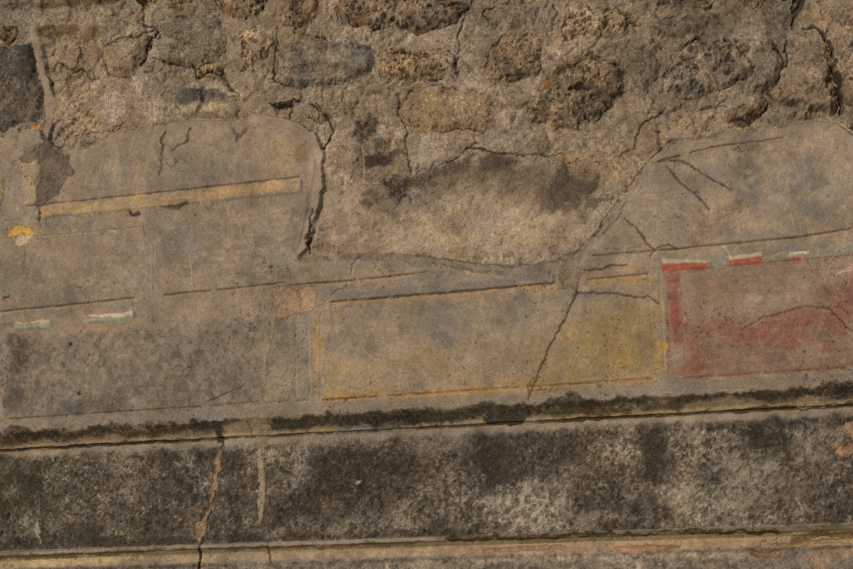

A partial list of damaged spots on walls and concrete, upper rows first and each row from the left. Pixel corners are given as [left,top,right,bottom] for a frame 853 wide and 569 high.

flaking render [650,111,733,140]
flaking render [20,123,74,206]
crack [529,264,650,394]
water stain [267,392,724,430]
water stain [723,381,853,414]
water stain [0,414,243,446]
flaking render [833,420,853,456]
crack [193,441,224,569]
spalling [744,537,853,558]